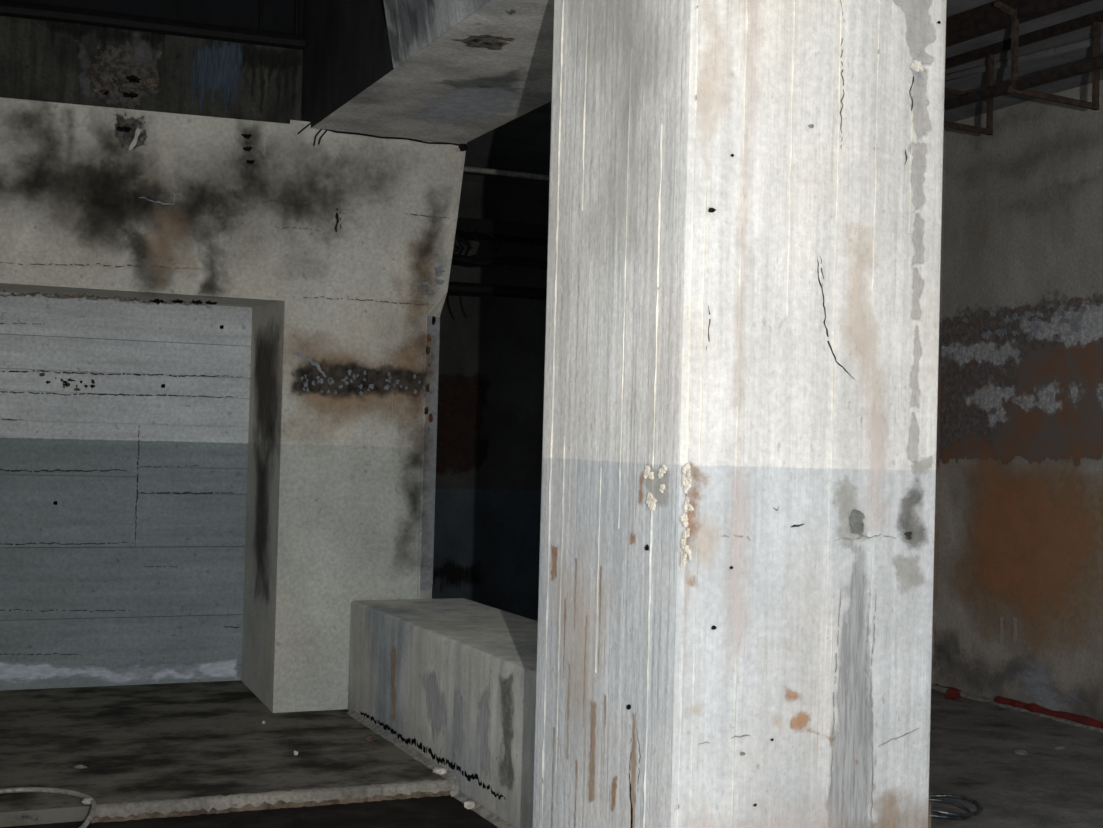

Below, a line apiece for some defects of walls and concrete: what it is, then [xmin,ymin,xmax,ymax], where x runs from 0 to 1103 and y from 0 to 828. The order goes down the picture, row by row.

crack [817,257,854,379]
peeling [936,293,1103,467]
peeling [300,316,488,589]
peeling [644,465,669,510]
damp [900,489,925,546]
damp [895,557,921,587]
rust [589,696,606,801]
rust [791,713,808,730]
damp [828,546,877,828]